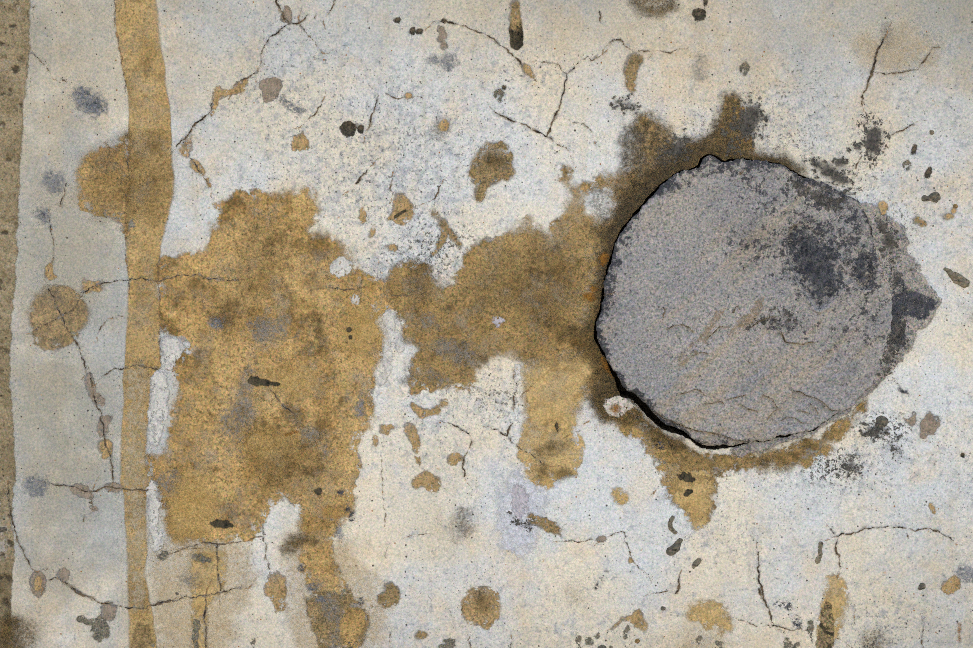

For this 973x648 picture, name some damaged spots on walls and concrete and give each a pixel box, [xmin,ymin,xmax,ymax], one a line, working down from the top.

crack [113,3,126,92]
crack [160,0,336,182]
crack [425,11,683,156]
crack [861,22,939,118]
crack [343,93,423,204]
crack [27,130,251,522]
crack [6,480,272,648]
crack [736,542,815,632]
peeling [815,574,848,648]
crack [825,526,957,579]